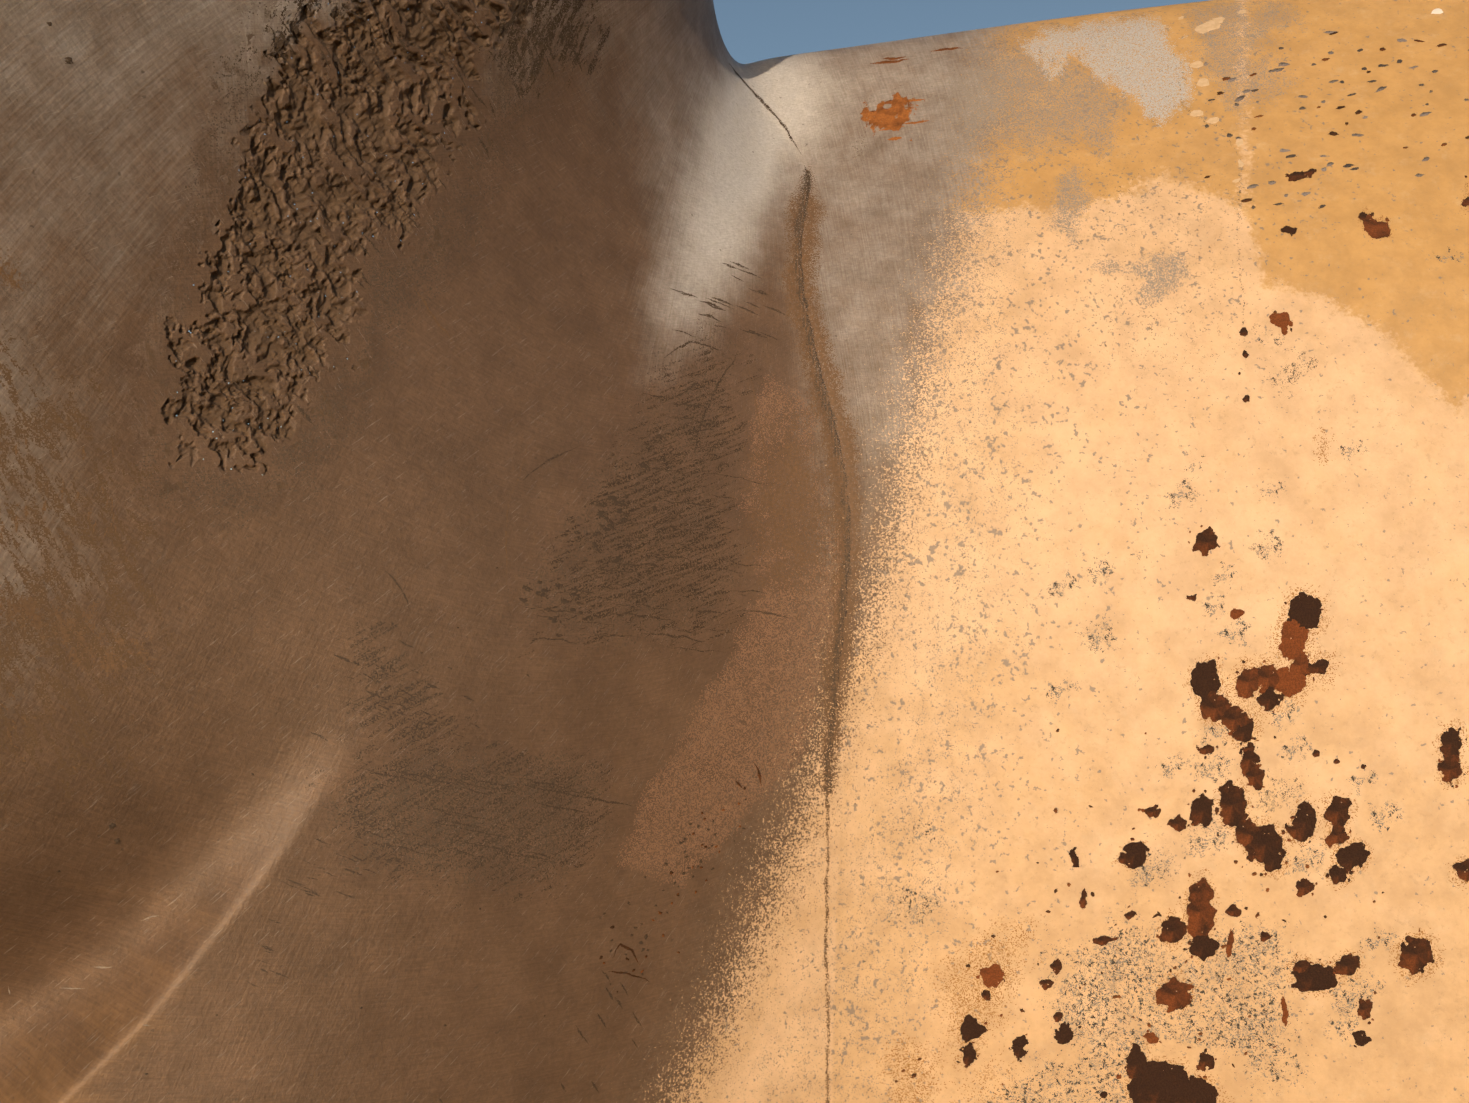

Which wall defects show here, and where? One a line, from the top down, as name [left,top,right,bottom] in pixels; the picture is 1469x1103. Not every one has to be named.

spalling [111,0,620,549]
rust [1188,525,1220,557]
crack [731,66,866,1103]
rust [1141,583,1374,897]
rust [1431,718,1469,790]
rust [1111,838,1156,871]
rust [876,914,1062,1103]
rust [1148,869,1248,1017]
rust [1281,948,1370,1027]
rust [1352,998,1374,1048]
rust [1388,926,1446,987]
rust [1119,1030,1234,1103]